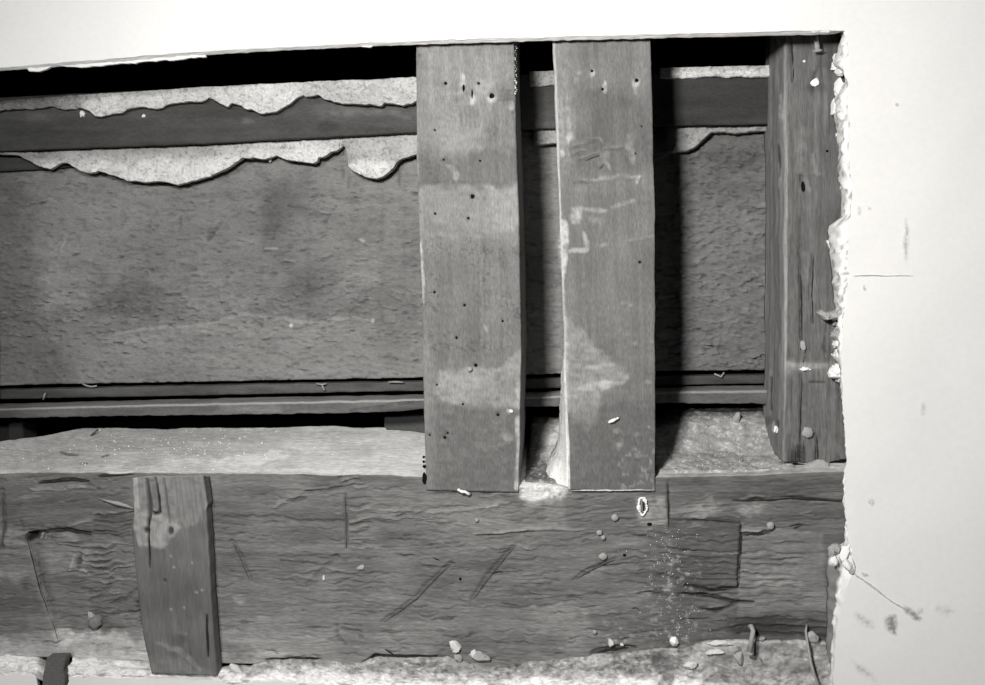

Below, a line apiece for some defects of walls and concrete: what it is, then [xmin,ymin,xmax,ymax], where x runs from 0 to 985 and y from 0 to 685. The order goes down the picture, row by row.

flaking render [830,53,844,115]
crack [852,559,905,609]